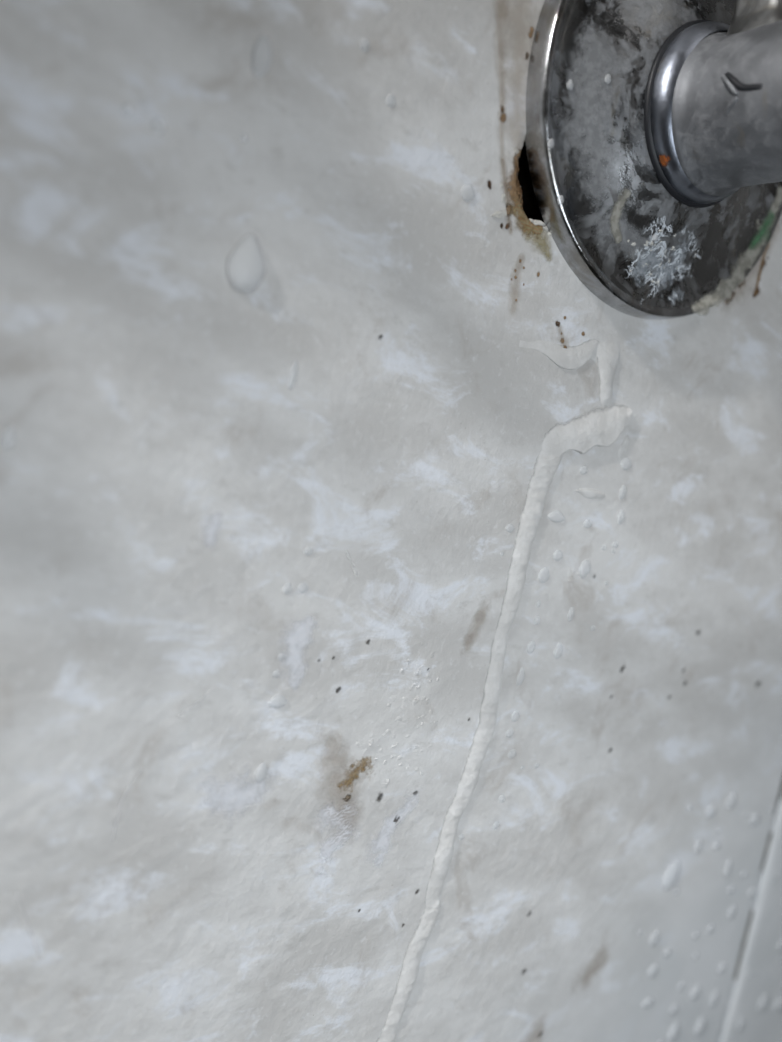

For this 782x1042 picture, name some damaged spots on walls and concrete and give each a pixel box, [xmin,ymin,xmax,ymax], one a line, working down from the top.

corrosion [500,150,550,258]
spalling [514,142,552,236]